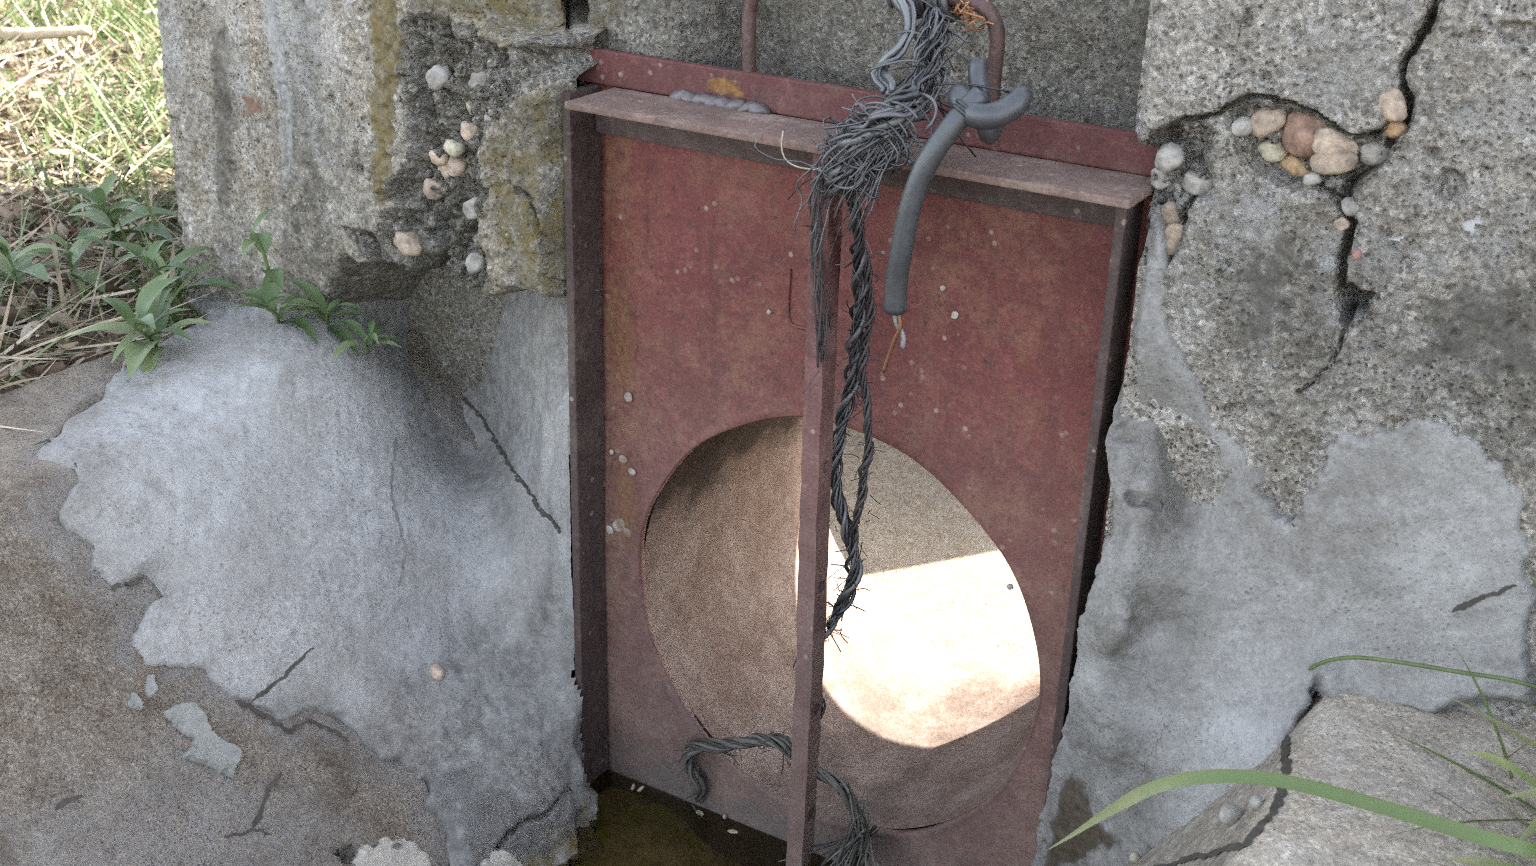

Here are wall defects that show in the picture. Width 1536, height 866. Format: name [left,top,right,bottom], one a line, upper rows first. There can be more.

corrosion [708,78,744,97]
spalling [341,11,603,295]
spalling [1138,89,1415,266]
crack [1146,0,1444,394]
spalling [1338,282,1375,327]
peeling [128,674,243,779]
crack [235,648,350,742]
crack [226,771,282,838]
spalling [334,843,358,864]